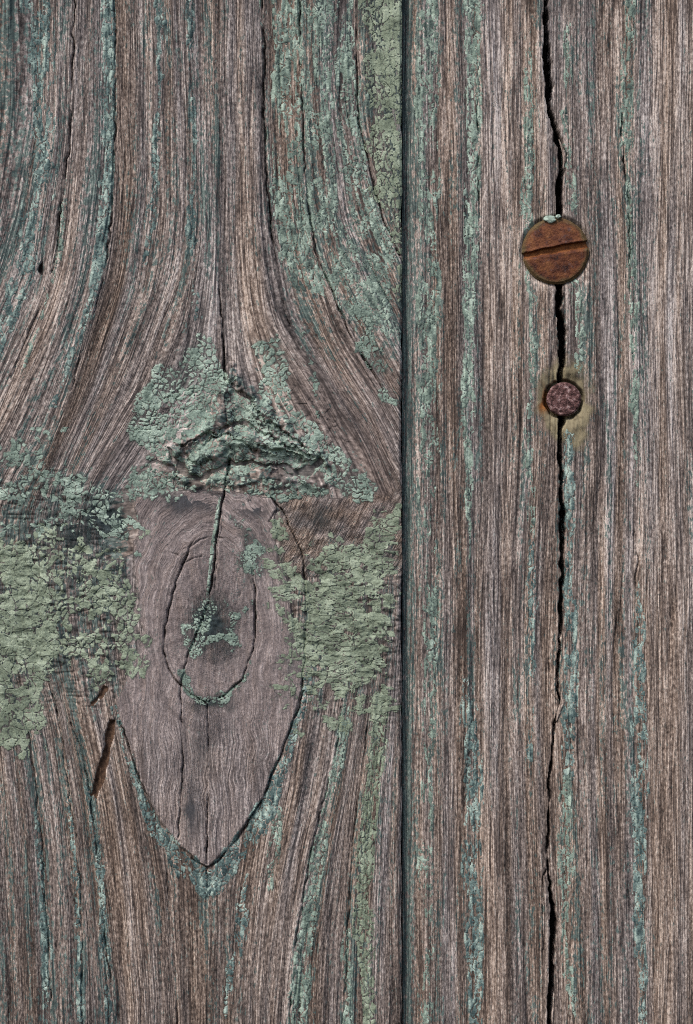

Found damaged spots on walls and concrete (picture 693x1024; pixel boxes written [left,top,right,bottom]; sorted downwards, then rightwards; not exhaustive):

crack [542,0,563,218]
crack [555,284,565,383]
rust [537,362,592,450]
crack [163,474,228,722]
crack [219,584,257,698]
crack [547,415,564,834]
crack [542,866,556,1024]